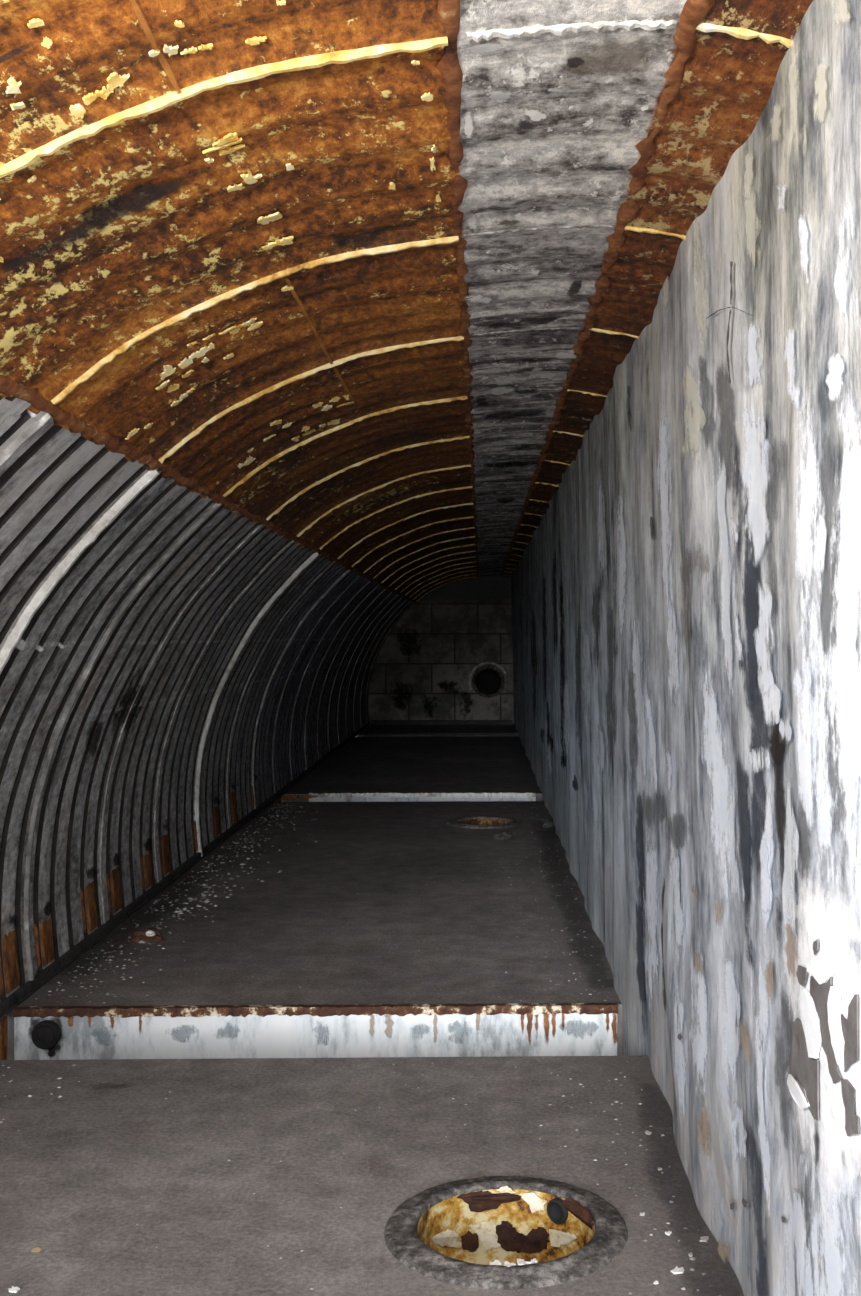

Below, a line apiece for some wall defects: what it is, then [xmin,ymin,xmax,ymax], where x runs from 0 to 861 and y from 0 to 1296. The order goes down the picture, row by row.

peeling [27,18,53,49]
peeling [148,43,214,58]
peeling [5,77,25,110]
peeling [69,72,130,119]
peeling [155,318,263,407]
corrosion [140,819,171,889]
corrosion [80,853,122,933]
corrosion [0,914,20,996]
corrosion [369,1015,393,1037]
corrosion [521,1013,565,1043]
corrosion [606,1013,618,1043]
peeling [783,877,861,1212]